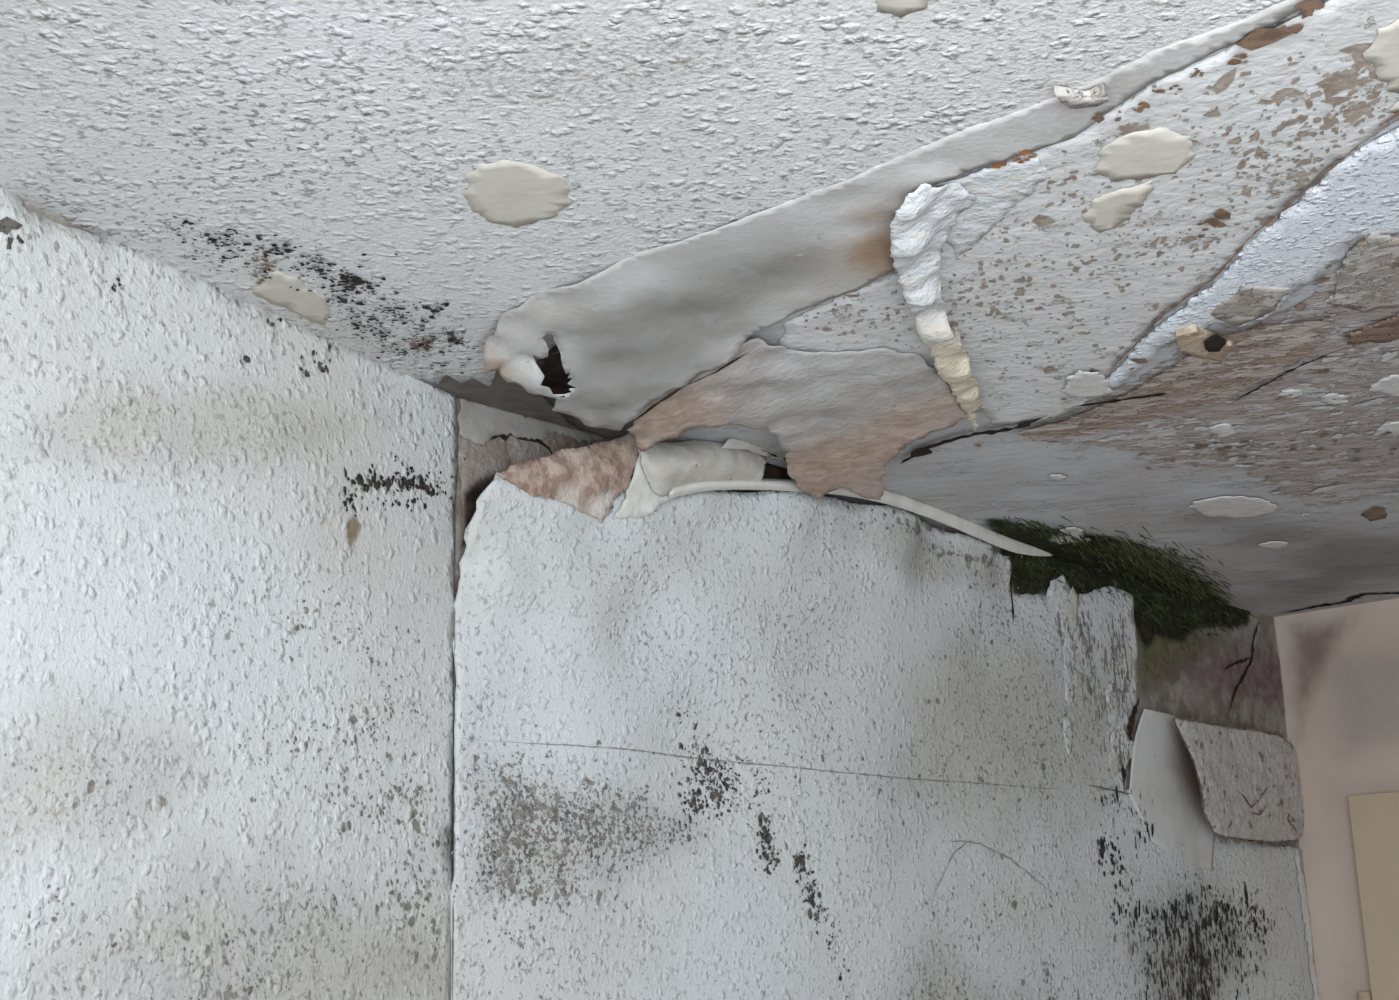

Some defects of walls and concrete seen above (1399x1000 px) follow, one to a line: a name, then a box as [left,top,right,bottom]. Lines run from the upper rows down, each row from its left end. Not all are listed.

peeling [876,0,930,18]
damp [0,216,25,249]
damp [130,216,479,377]
peeling [463,160,572,228]
peeling [777,271,952,391]
peeling [939,0,1399,521]
damp [339,455,495,544]
flaking render [457,398,611,549]
peeling [1050,527,1090,544]
damp [47,748,133,825]
damp [107,508,1098,1000]
damp [1092,769,1291,1000]